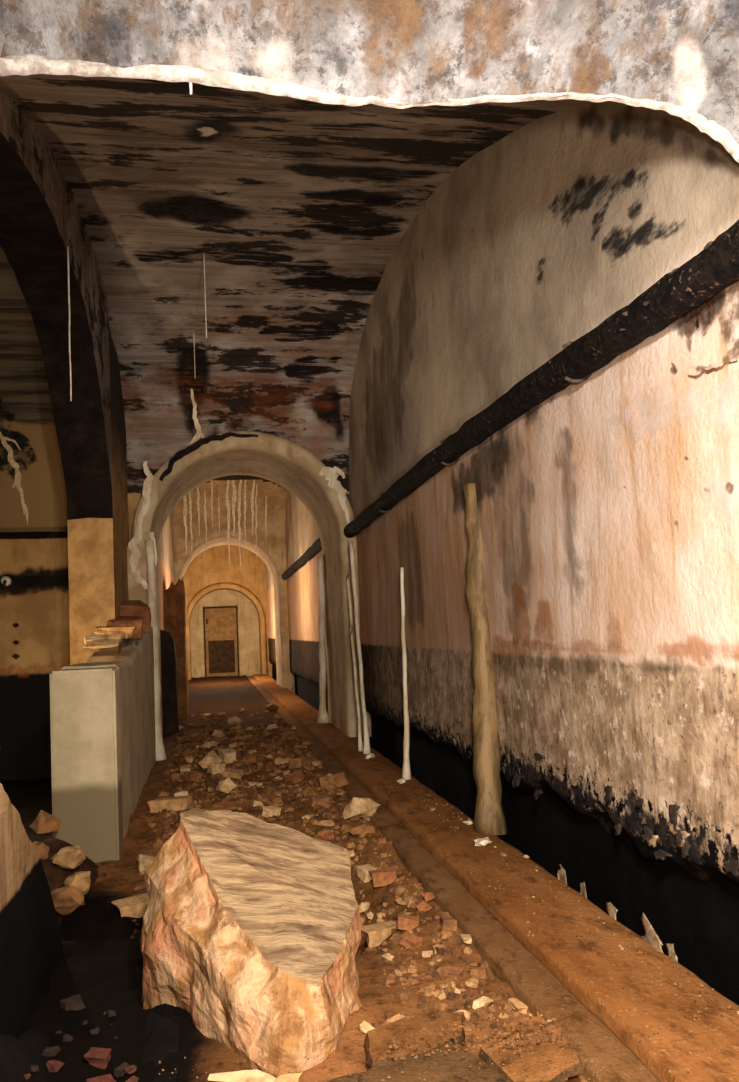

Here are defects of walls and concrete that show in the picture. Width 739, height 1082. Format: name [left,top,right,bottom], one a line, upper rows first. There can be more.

mould [0,399,36,478]
leakage [186,389,204,446]
spalling [504,743,739,881]
peeling [557,863,567,885]
peeling [603,902,618,924]
peeling [641,912,678,963]